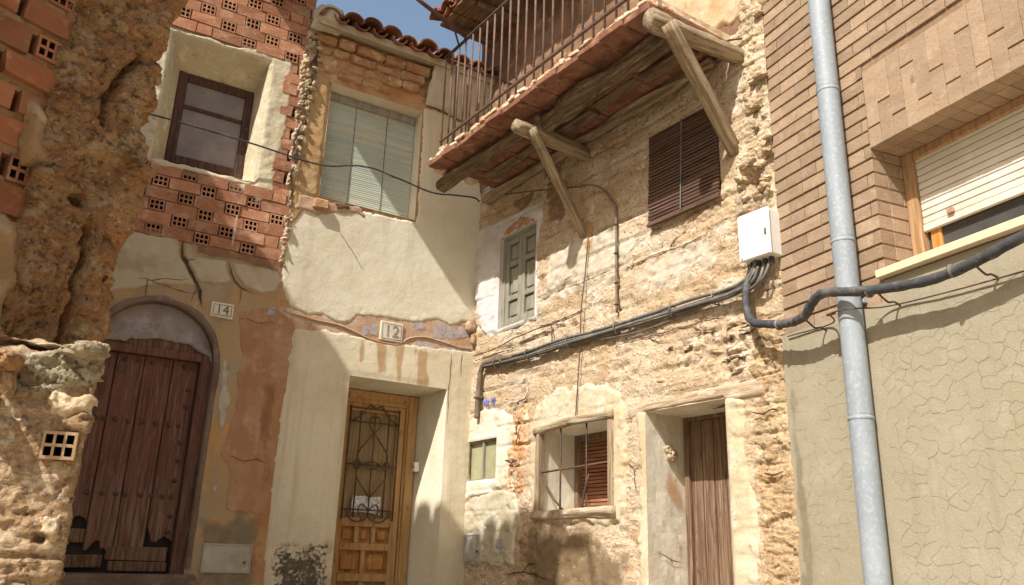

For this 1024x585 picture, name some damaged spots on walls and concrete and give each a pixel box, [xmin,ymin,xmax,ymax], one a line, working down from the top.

crack [142,241,202,306]
crack [229,264,253,302]
flaking render [220,306,477,517]
crack [793,343,862,583]
crack [880,274,1024,585]